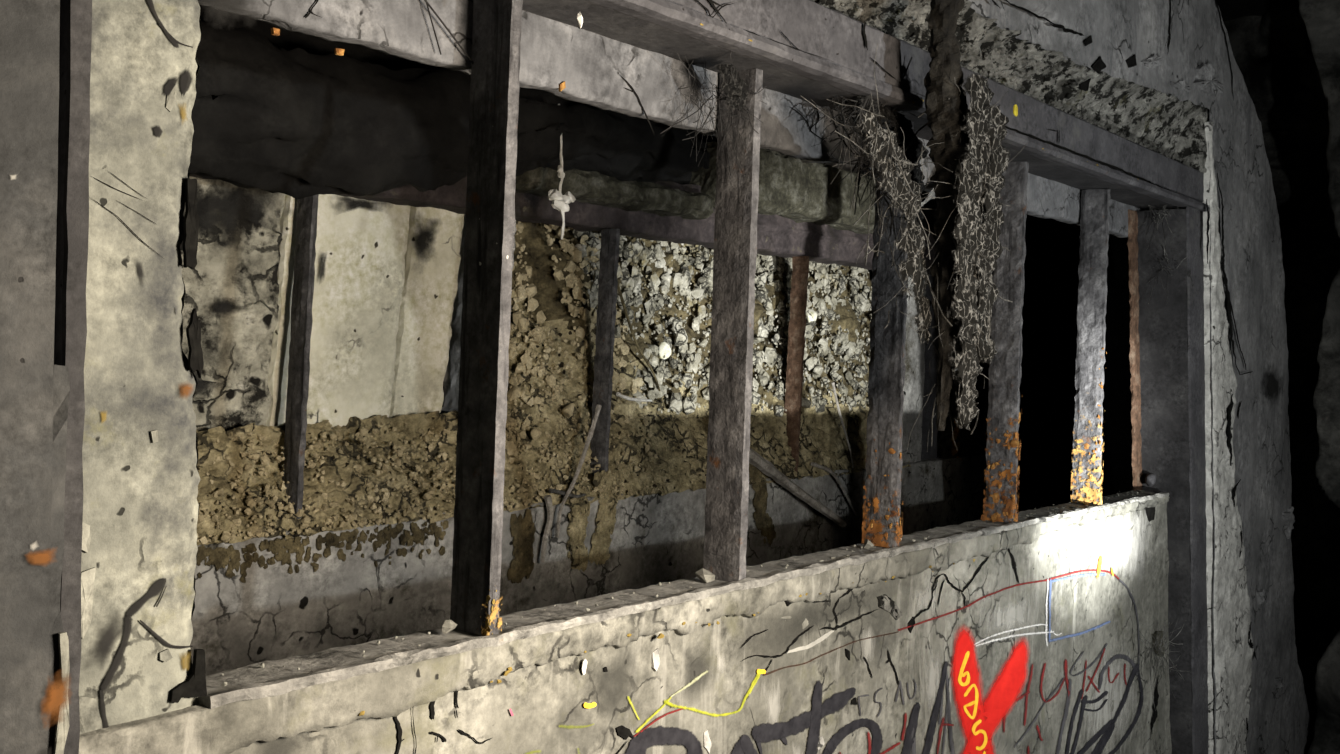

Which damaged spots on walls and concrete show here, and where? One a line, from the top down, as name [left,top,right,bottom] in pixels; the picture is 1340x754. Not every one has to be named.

spalling [812,0,931,51]
rust [862,462,903,548]
rust [983,417,1021,523]
rust [1070,416,1104,505]
rust [481,599,502,636]
crack [741,589,878,671]
crack [864,651,899,685]
crack [914,548,1019,620]